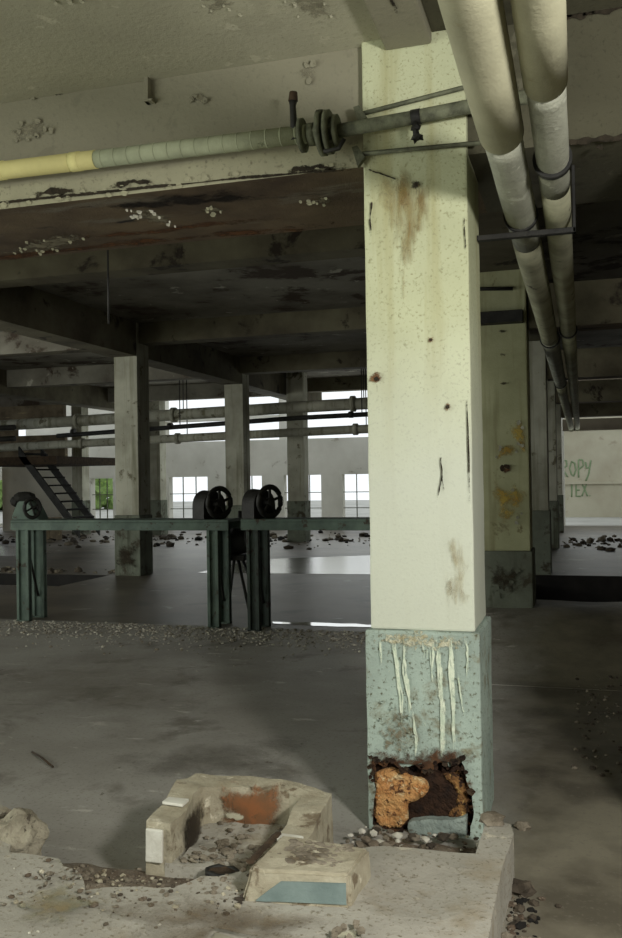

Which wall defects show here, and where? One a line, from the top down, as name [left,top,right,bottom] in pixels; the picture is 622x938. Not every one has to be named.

crack [567,7,622,20]
spalling [0,163,351,209]
peeling [125,209,176,228]
efflorescence [379,630,468,755]
spalling [367,701,475,836]